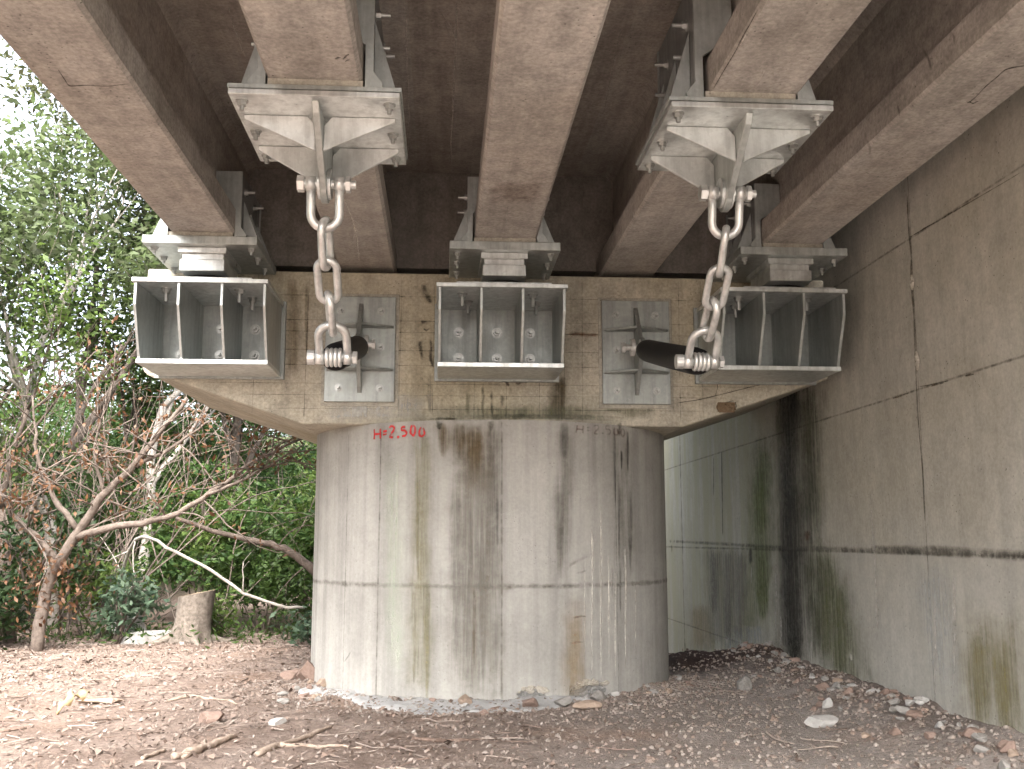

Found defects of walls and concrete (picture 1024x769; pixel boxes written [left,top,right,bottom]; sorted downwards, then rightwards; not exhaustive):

crack [895,175,1016,513]
leakage [458,432,498,678]
leakage [584,521,636,671]
leakage [699,393,852,667]
leakage [844,546,1024,561]